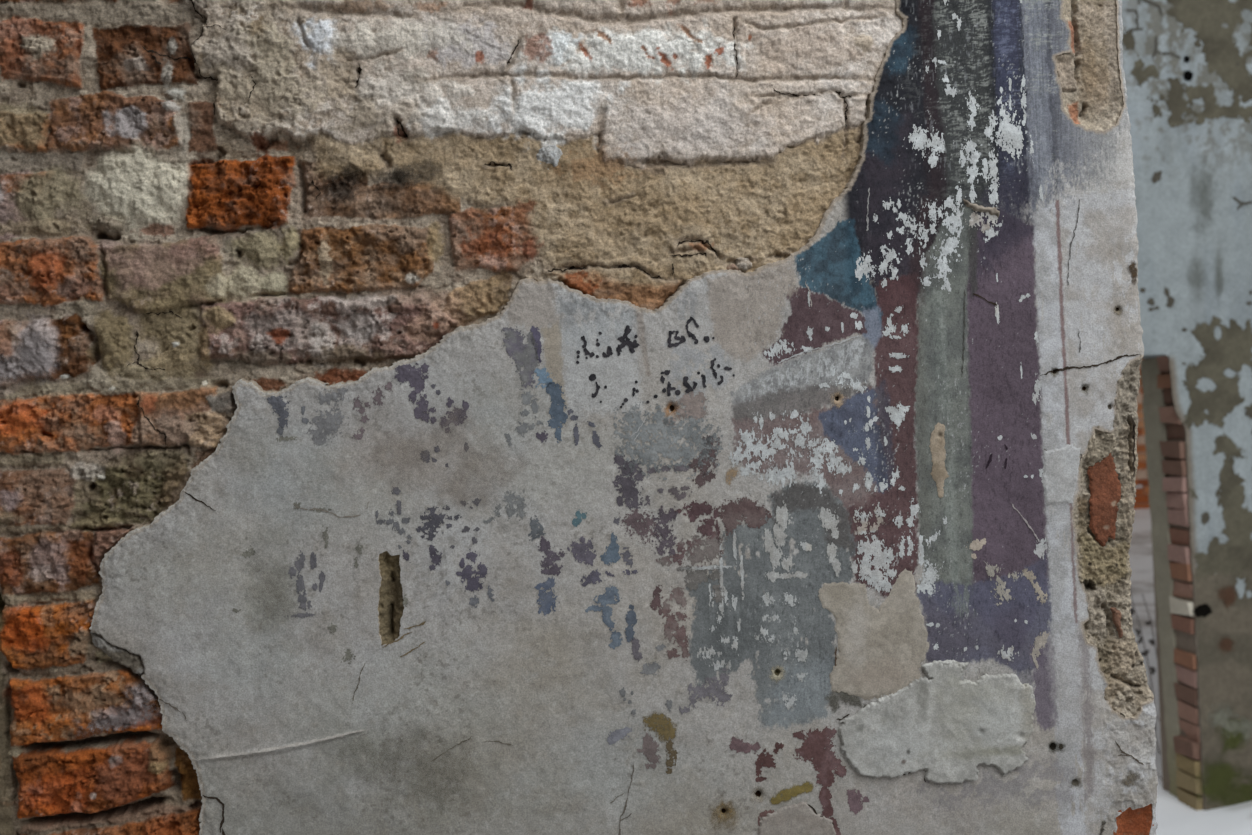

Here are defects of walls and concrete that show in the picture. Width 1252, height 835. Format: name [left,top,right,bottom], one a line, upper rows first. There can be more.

crack [142,0,256,115]
crack [772,85,851,126]
flaking render [1055,0,1252,131]
crack [1067,199,1080,285]
crack [1040,332,1141,376]
peeling [1140,287,1175,311]
flaking render [0,0,949,835]
flaking render [1073,355,1154,719]
peeling [1182,290,1252,810]
flaking render [1113,804,1154,835]